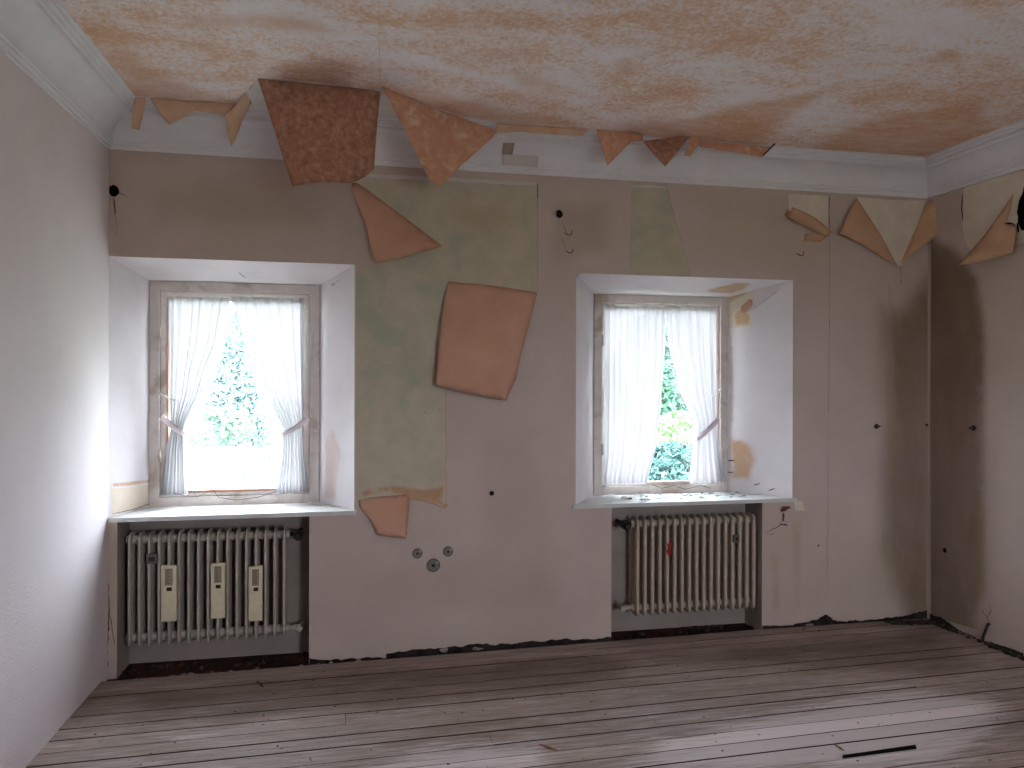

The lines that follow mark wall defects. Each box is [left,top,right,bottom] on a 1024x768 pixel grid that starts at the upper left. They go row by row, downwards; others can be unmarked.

flaking render [247,78,343,109]
flaking render [358,86,403,118]
flaking render [630,183,691,277]
flaking render [789,194,830,228]
flaking render [856,197,925,283]
flaking render [961,170,1024,250]
flaking render [356,174,538,504]